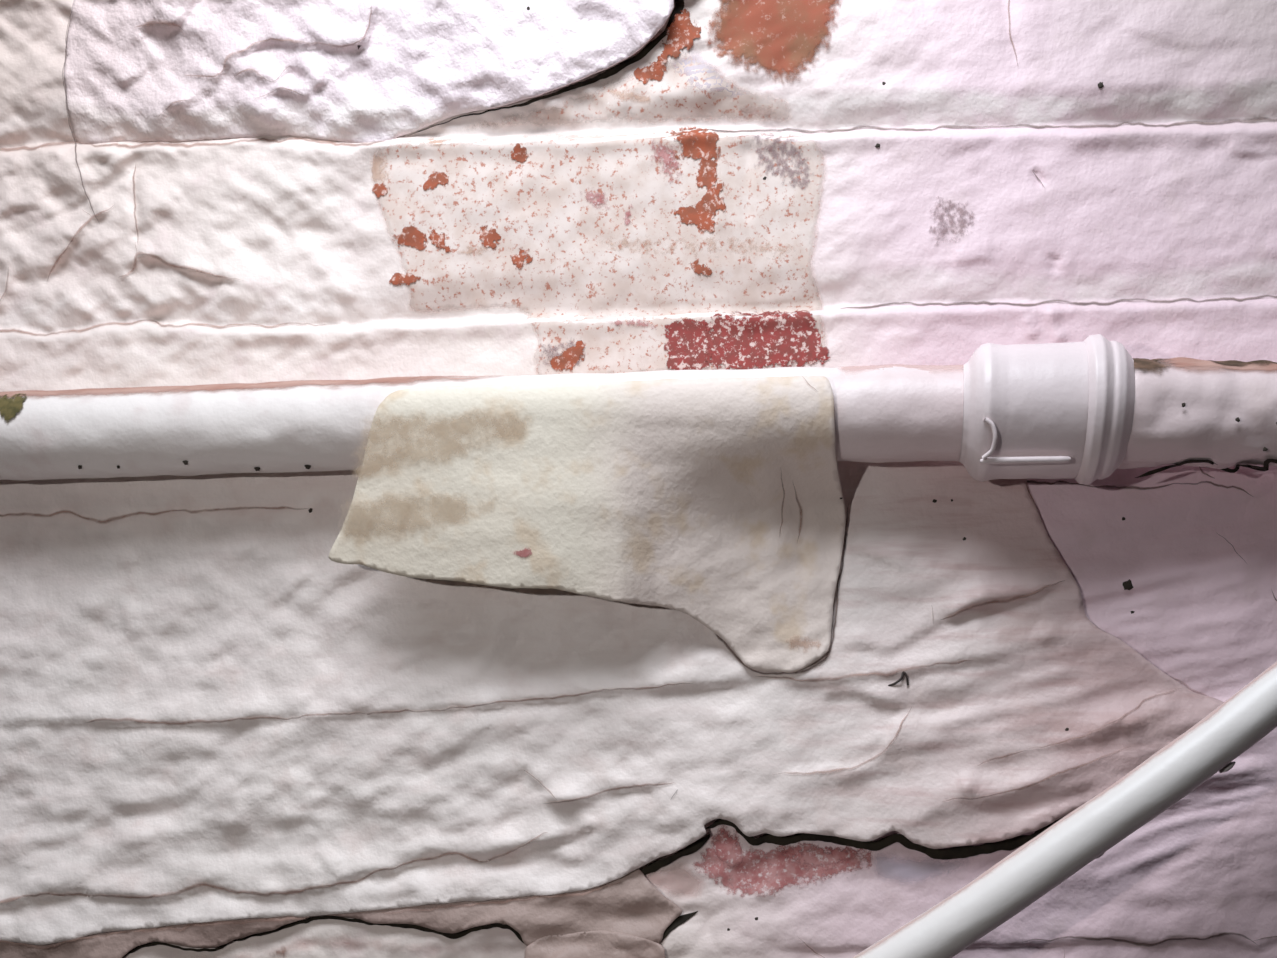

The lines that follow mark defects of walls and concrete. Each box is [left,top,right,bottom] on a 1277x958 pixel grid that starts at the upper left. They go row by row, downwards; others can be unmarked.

crack [0,7,369,281]
spalling [64,0,839,375]
peeling [0,376,1224,958]